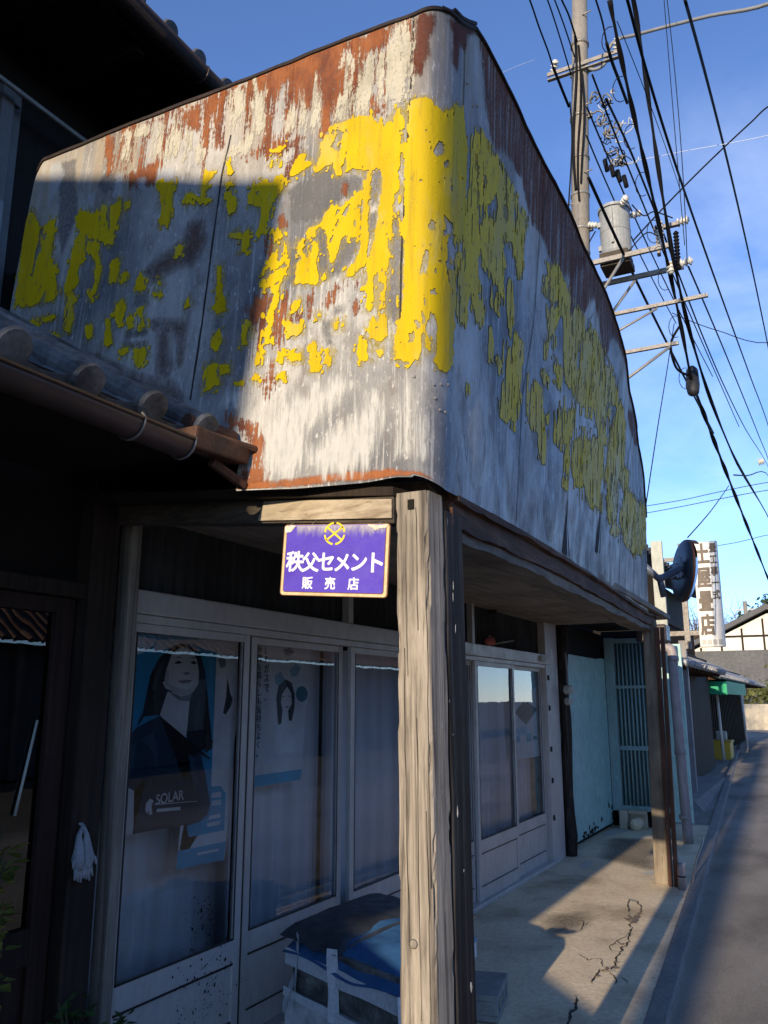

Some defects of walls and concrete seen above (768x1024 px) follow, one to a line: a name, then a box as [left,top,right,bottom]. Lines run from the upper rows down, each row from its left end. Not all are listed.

rust [102,13,436,190]
peeling [14,196,164,369]
peeling [120,19,647,559]
rust [225,409,431,490]
crack [567,923,633,1024]